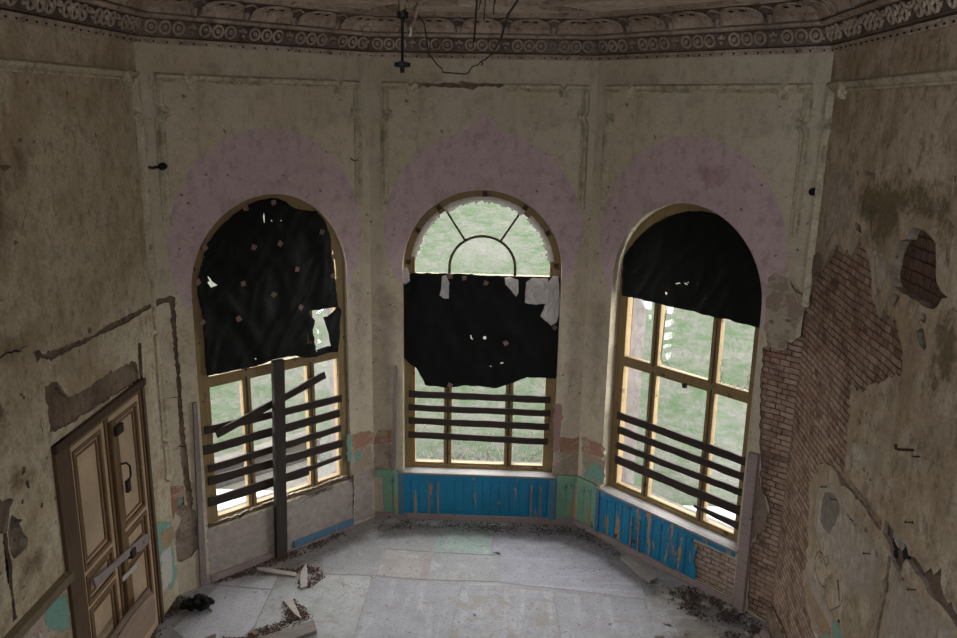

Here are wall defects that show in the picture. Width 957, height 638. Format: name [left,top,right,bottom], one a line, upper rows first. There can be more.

peeling [287,430,392,497]
peeling [552,403,605,485]
flaking render [747,222,948,638]